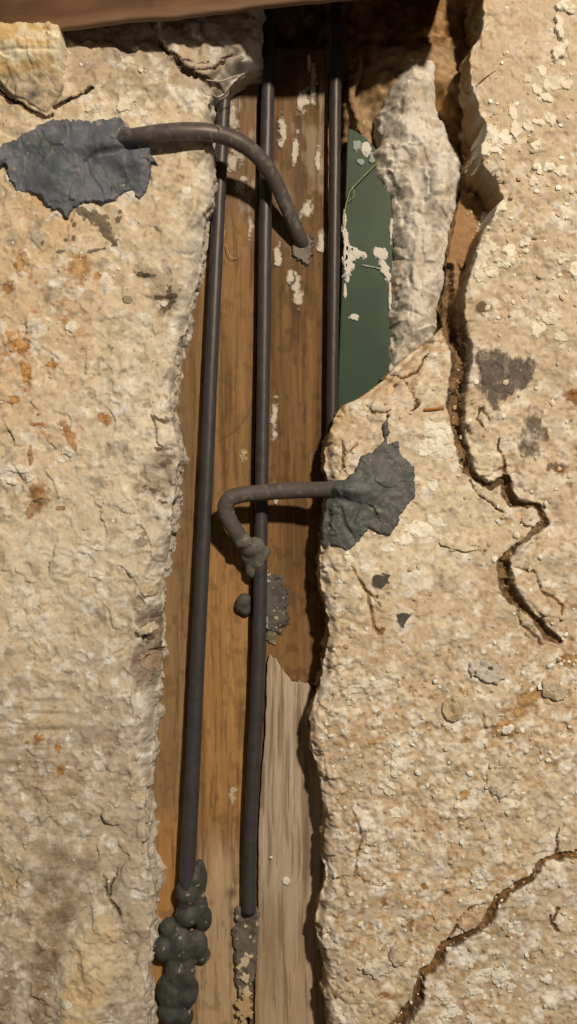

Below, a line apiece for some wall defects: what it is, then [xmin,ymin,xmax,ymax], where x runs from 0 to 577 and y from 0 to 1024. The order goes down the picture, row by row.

peeling [297,54,318,114]
peeling [227,148,248,194]
peeling [278,119,299,166]
peeling [353,140,375,166]
peeling [299,200,314,218]
peeling [274,242,304,305]
peeling [317,232,327,252]
peeling [341,209,393,314]
leakage [475,349,535,410]
peeling [270,396,278,440]
crack [367,264,565,645]
crack [390,827,577,1024]